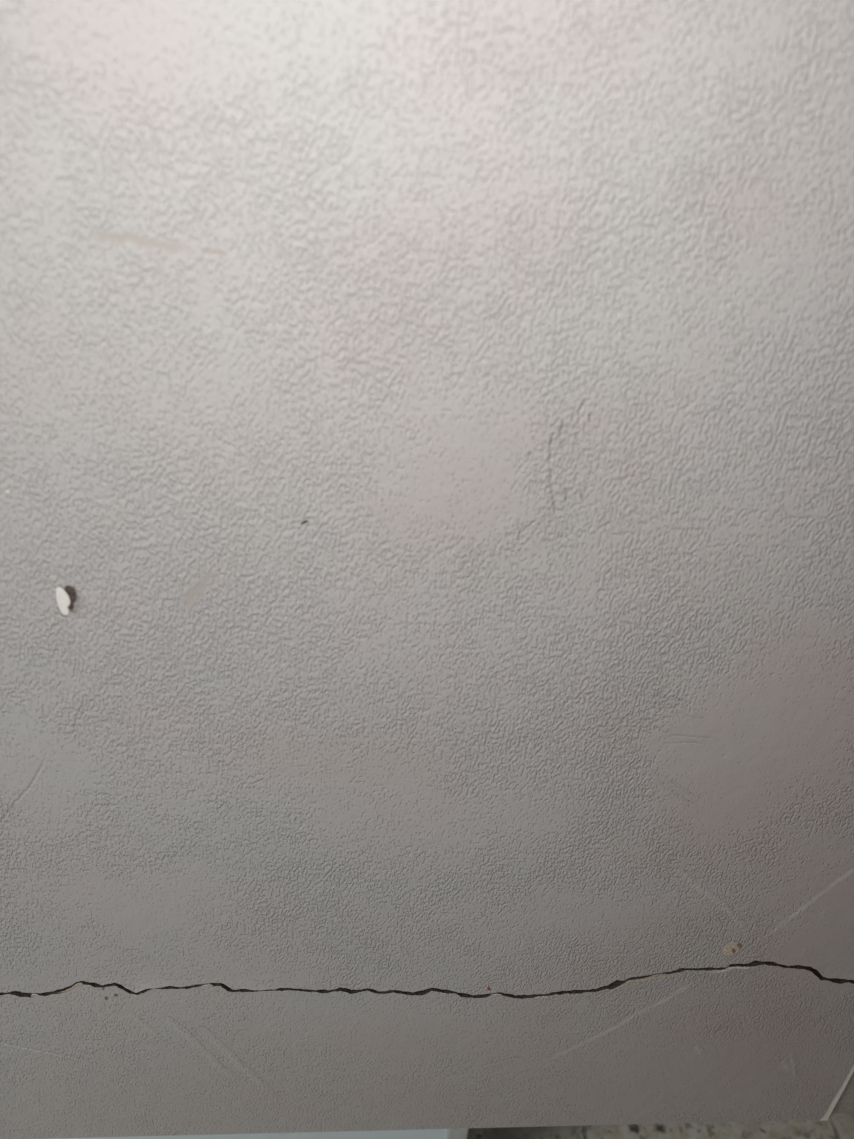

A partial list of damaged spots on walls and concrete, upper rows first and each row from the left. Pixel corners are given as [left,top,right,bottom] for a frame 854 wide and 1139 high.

crack [0,960,854,1000]